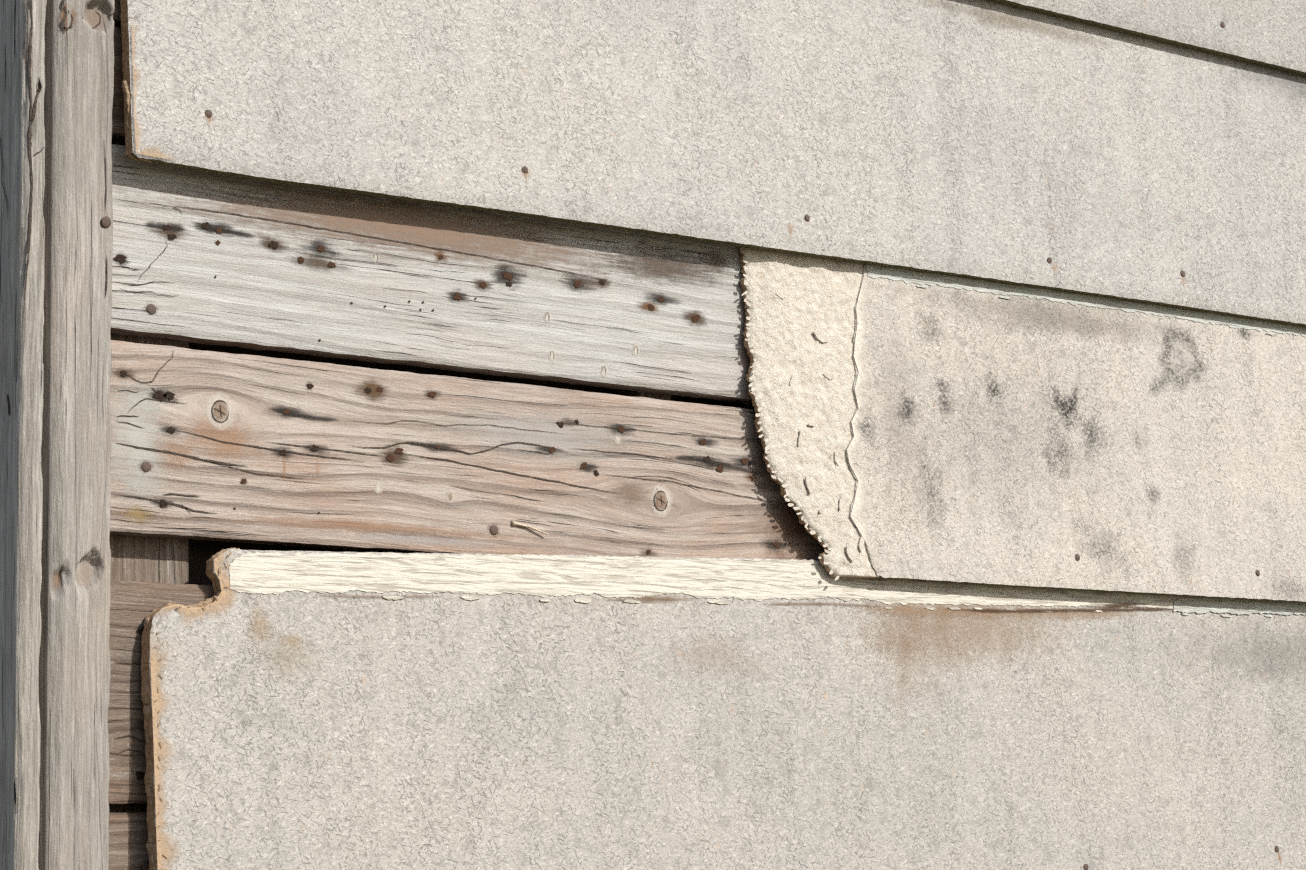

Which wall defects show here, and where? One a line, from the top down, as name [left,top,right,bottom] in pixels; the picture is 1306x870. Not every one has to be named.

peeling [140,247,1306,870]